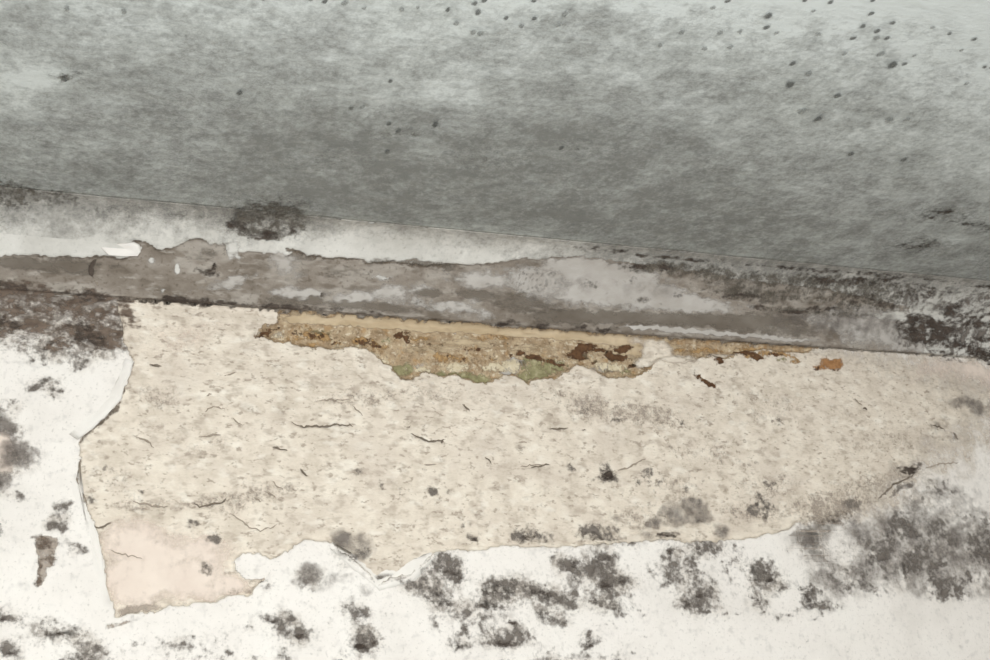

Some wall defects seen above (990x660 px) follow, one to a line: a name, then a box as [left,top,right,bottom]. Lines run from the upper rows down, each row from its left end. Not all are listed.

leakage [120,91,990,365]
leakage [0,280,140,370]
leakage [28,377,64,393]
leakage [0,416,29,465]
peeling [0,238,990,628]
leakage [47,501,73,533]
leakage [265,615,310,640]
leakage [345,606,381,653]
leakage [400,551,632,648]
leakage [580,524,619,541]
leakage [647,520,728,614]
leakage [801,504,990,620]